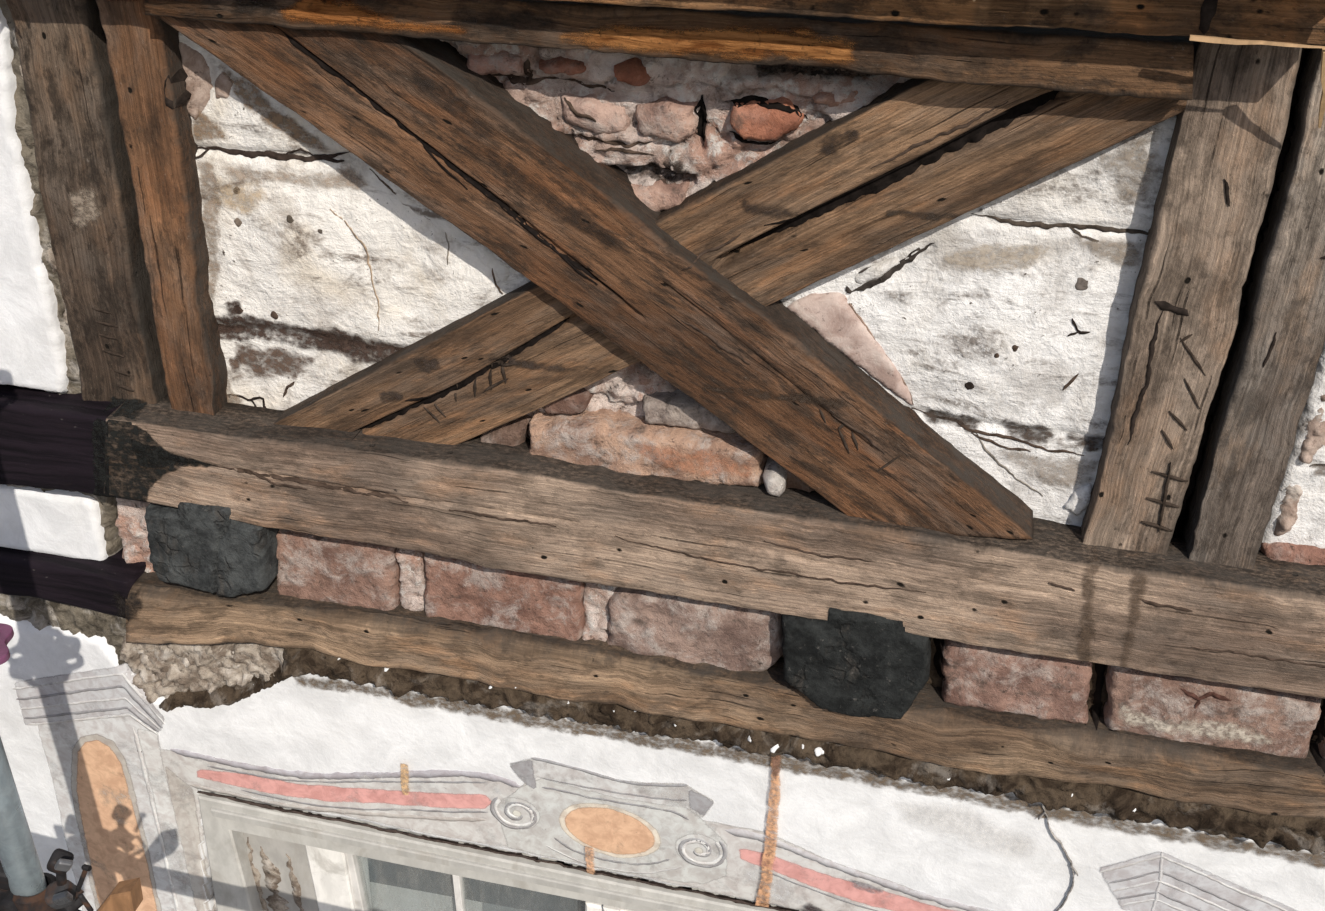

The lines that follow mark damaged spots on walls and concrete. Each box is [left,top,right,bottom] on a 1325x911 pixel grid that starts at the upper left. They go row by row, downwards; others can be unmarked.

crack [195,146,396,195]
crack [682,90,1059,270]
crack [971,213,1148,242]
crack [845,243,1084,497]
spalling [119,635,292,712]
crack [1181,689,1231,709]
crack [1191,647,1325,777]
peeling [246,837,304,911]
corrosion [401,764,409,795]
crack [197,791,799,911]
corrosion [755,755,781,907]
crack [1038,805,1078,911]